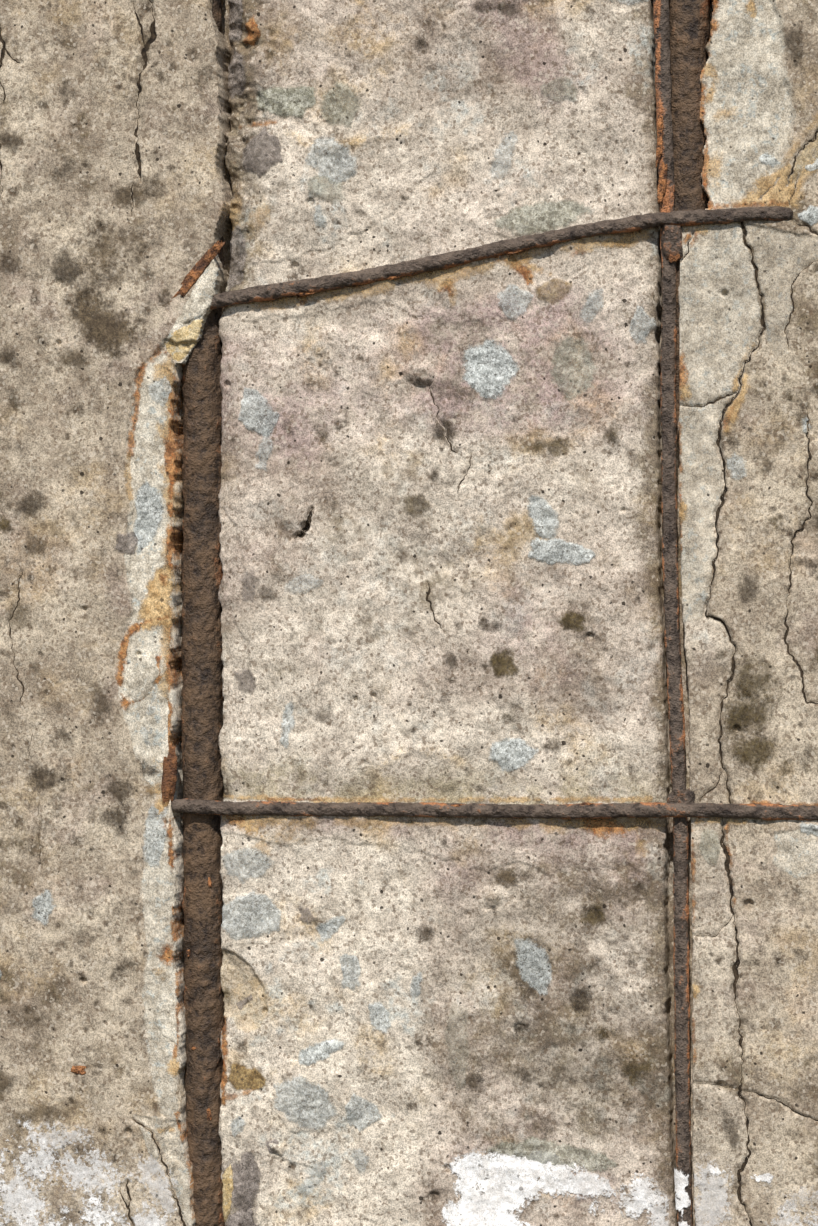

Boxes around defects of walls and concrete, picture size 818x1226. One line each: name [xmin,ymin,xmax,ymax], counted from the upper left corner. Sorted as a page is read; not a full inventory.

crack [0,27,21,102]
crack [131,0,157,216]
corrosion [495,249,539,285]
corrosion [678,355,690,399]
spalling [118,255,229,791]
crack [682,129,818,1226]
corrosion [313,797,540,807]
corrosion [555,796,652,836]
spalling [141,831,182,1120]
corrosion [159,906,197,1075]
peeling [751,1173,773,1183]
peeling [771,1203,818,1226]